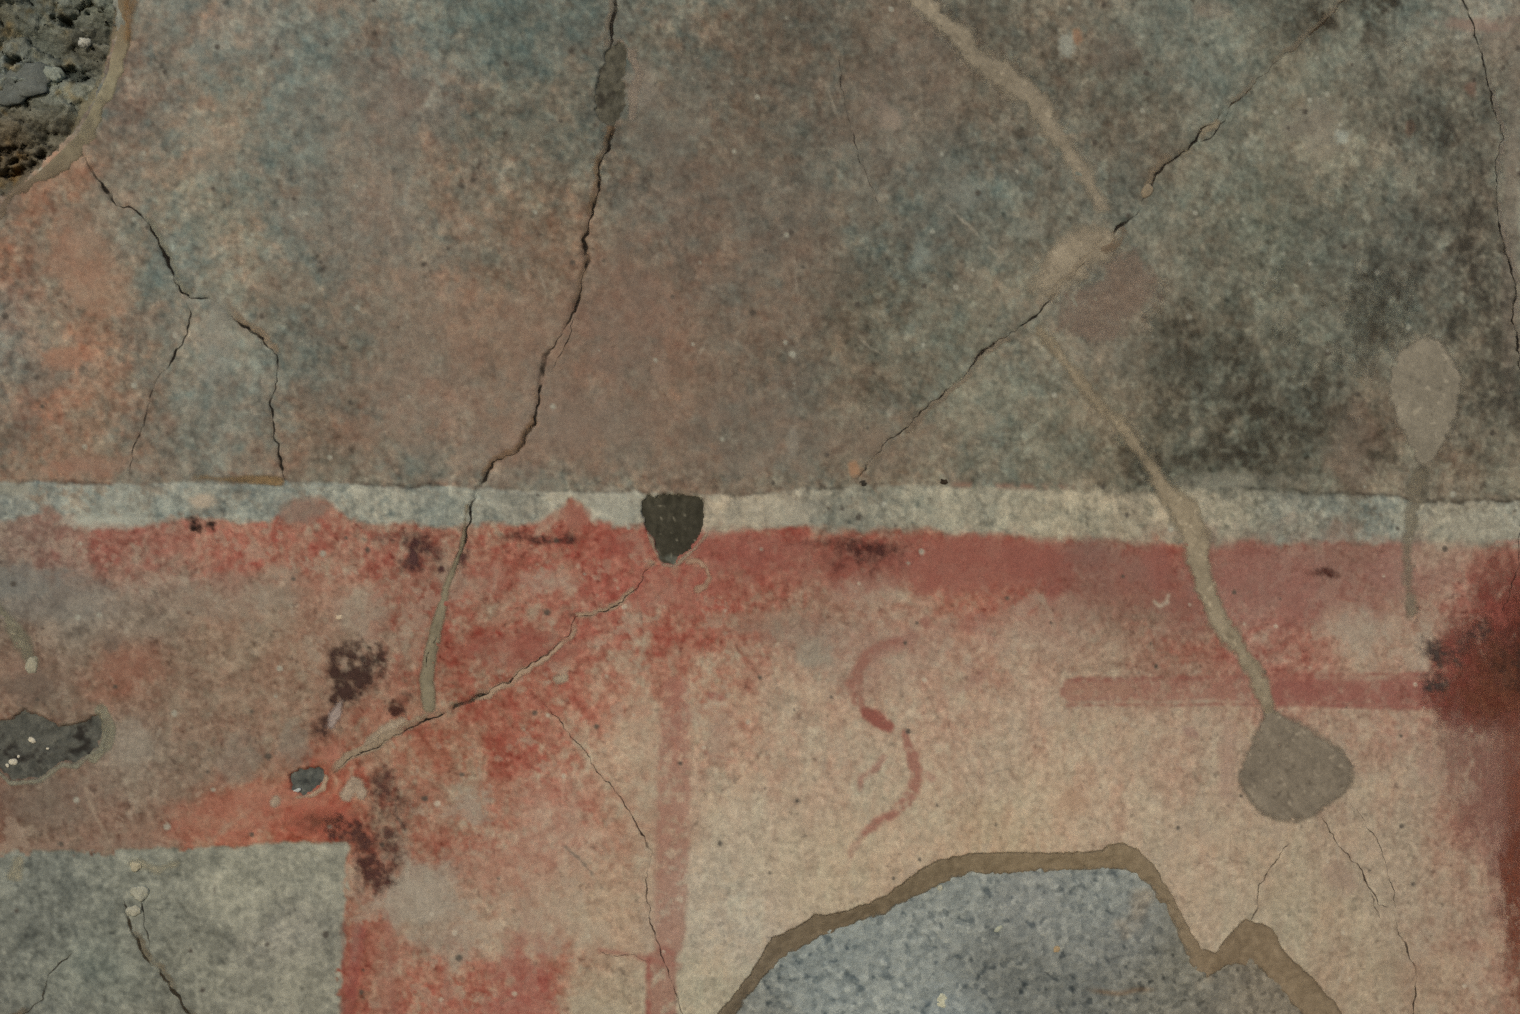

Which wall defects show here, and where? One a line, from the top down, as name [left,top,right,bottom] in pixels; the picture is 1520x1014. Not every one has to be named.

crack [605,0,617,47]
crack [865,0,1344,470]
crack [1462,0,1520,369]
crack [93,173,206,465]
crack [237,319,284,474]
crack [457,126,614,564]
crack [334,561,653,770]
spalling [0,705,115,785]
spalling [270,767,366,807]
crack [124,904,190,1014]
spalling [736,868,1302,1014]